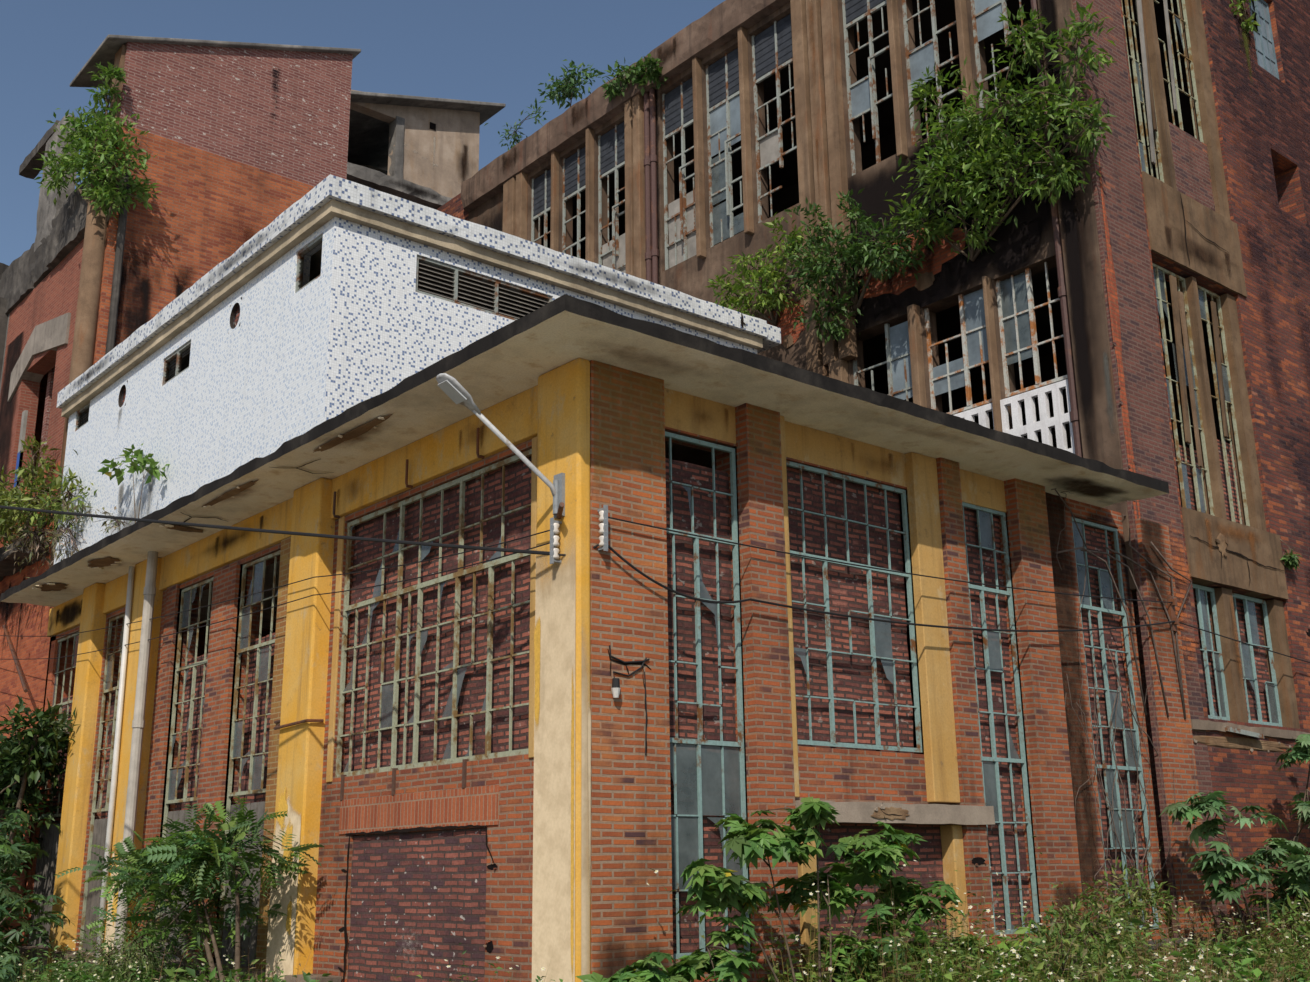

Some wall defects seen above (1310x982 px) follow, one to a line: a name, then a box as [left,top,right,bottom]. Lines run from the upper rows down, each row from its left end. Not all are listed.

damp [115,257,150,344]
damp [176,272,190,297]
damp [1207,0,1310,395]
peeling [265,787,301,981]